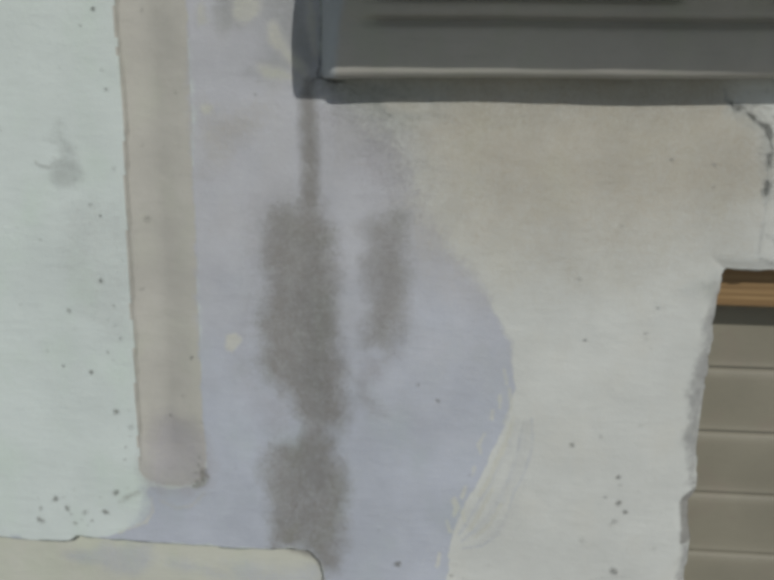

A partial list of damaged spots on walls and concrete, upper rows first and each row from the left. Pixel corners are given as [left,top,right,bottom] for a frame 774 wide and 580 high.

water stain [222,74,738,580]
crack [722,88,774,265]